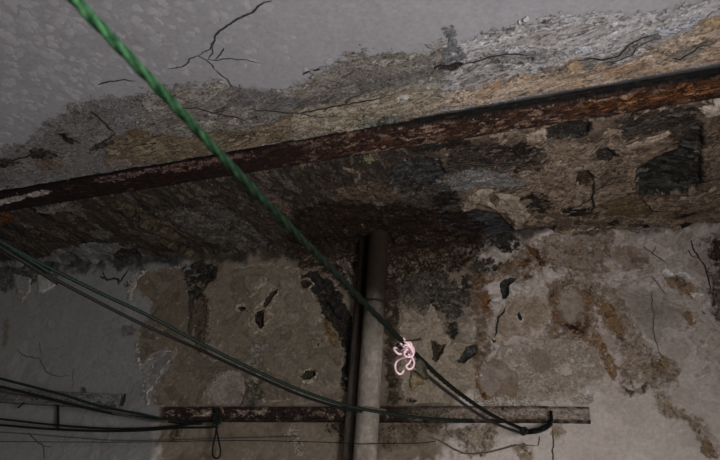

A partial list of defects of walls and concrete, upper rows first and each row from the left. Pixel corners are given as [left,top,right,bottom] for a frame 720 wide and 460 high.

crack [169,0,272,87]
flaking render [0,0,720,206]
crack [462,53,535,66]
crack [577,34,663,64]
rust [559,75,720,119]
mould [519,192,552,214]
flaking render [387,98,720,236]
flaking render [123,262,353,408]
leakage [256,179,523,405]
flaking render [398,275,607,406]
crack [688,240,711,294]
flaking render [699,233,720,321]